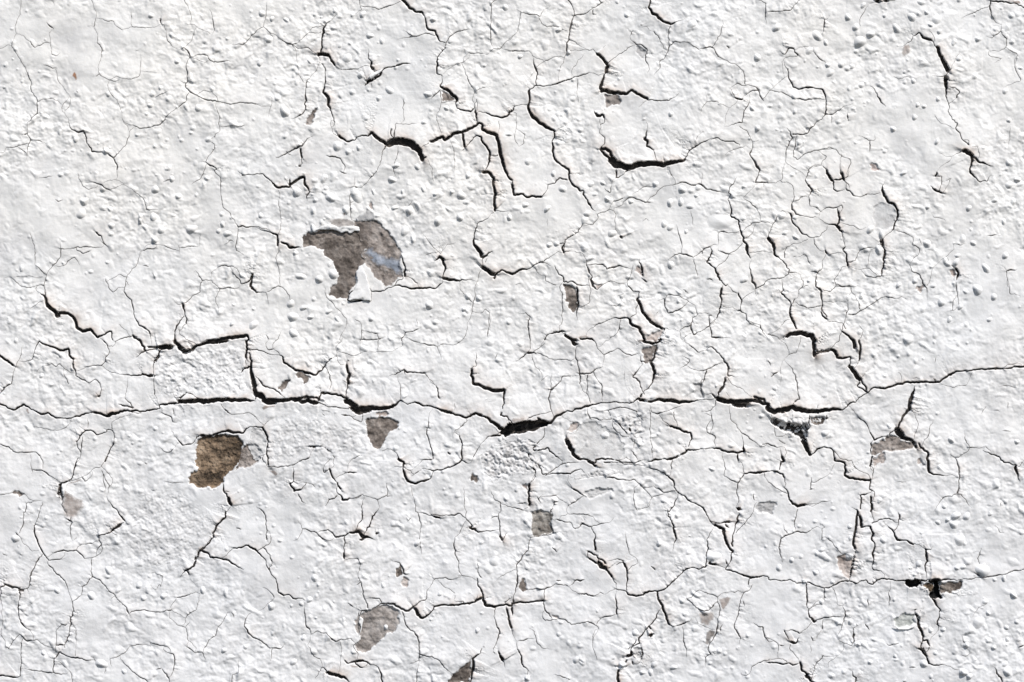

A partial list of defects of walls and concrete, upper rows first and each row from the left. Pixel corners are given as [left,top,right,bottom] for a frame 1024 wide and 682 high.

crack [587,32,679,101]
crack [906,31,991,220]
peeling [302,202,403,301]
peeling [563,284,578,313]
crack [0,423,157,678]
flaking render [119,411,399,572]
crack [180,484,383,682]
crack [176,421,388,570]
peeling [354,604,400,653]
crack [357,521,599,682]
peeling [531,509,553,537]
flaking render [893,579,963,630]